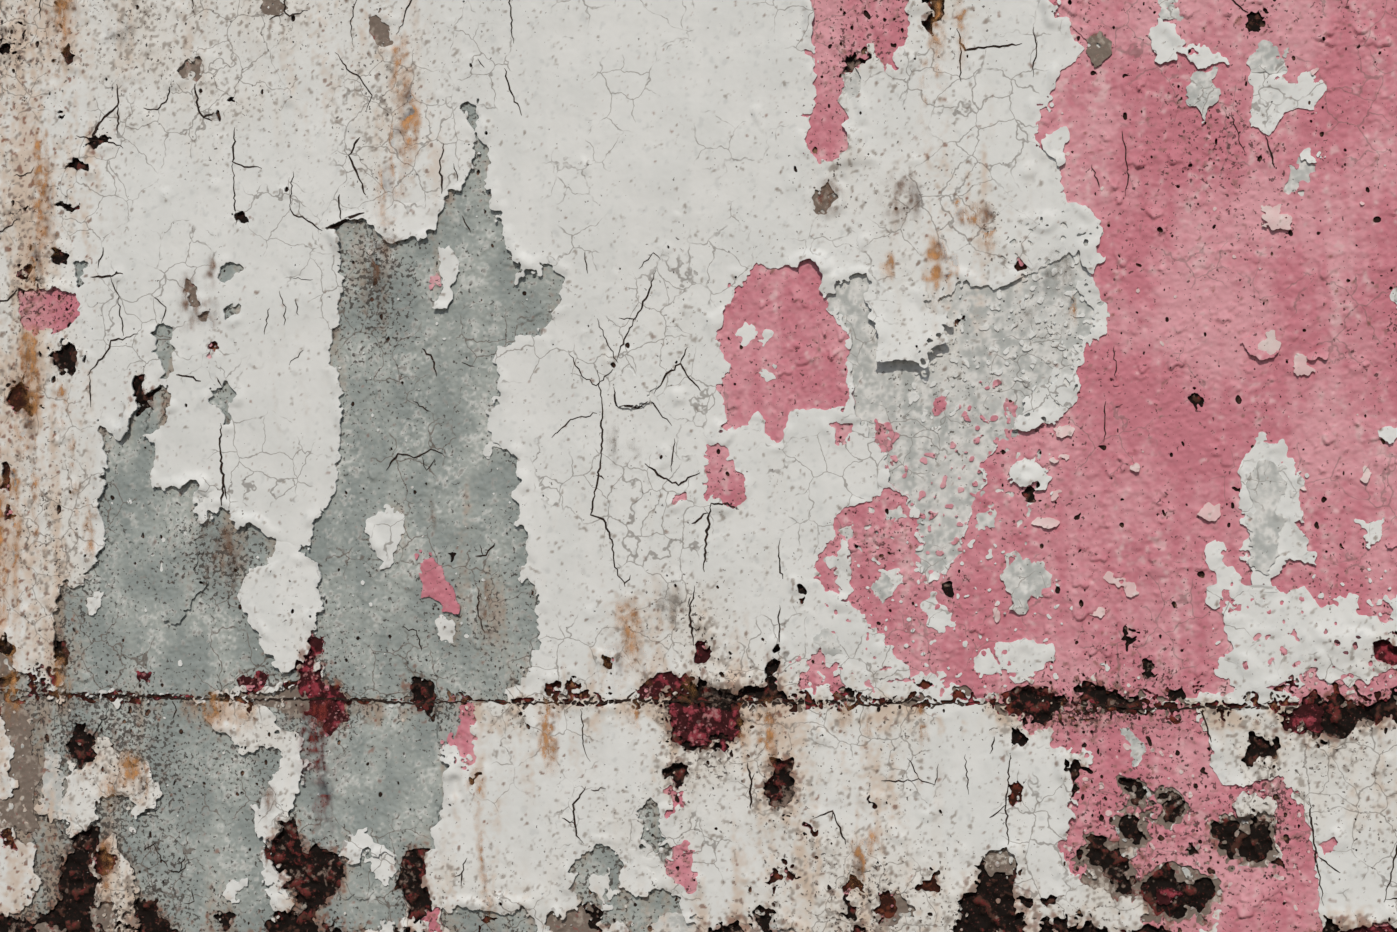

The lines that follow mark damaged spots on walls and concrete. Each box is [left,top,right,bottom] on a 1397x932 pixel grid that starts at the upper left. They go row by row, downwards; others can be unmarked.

crack [76,0,372,231]
crack [87,248,166,407]
crack [219,423,227,509]
peeling [0,99,855,932]
crack [552,252,738,646]
peeling [704,250,1095,633]
rust [1,653,255,719]
rust [448,687,678,759]
rust [738,690,890,749]
spalling [953,680,1285,932]
rust [1065,675,1299,722]
spalling [1241,686,1397,767]